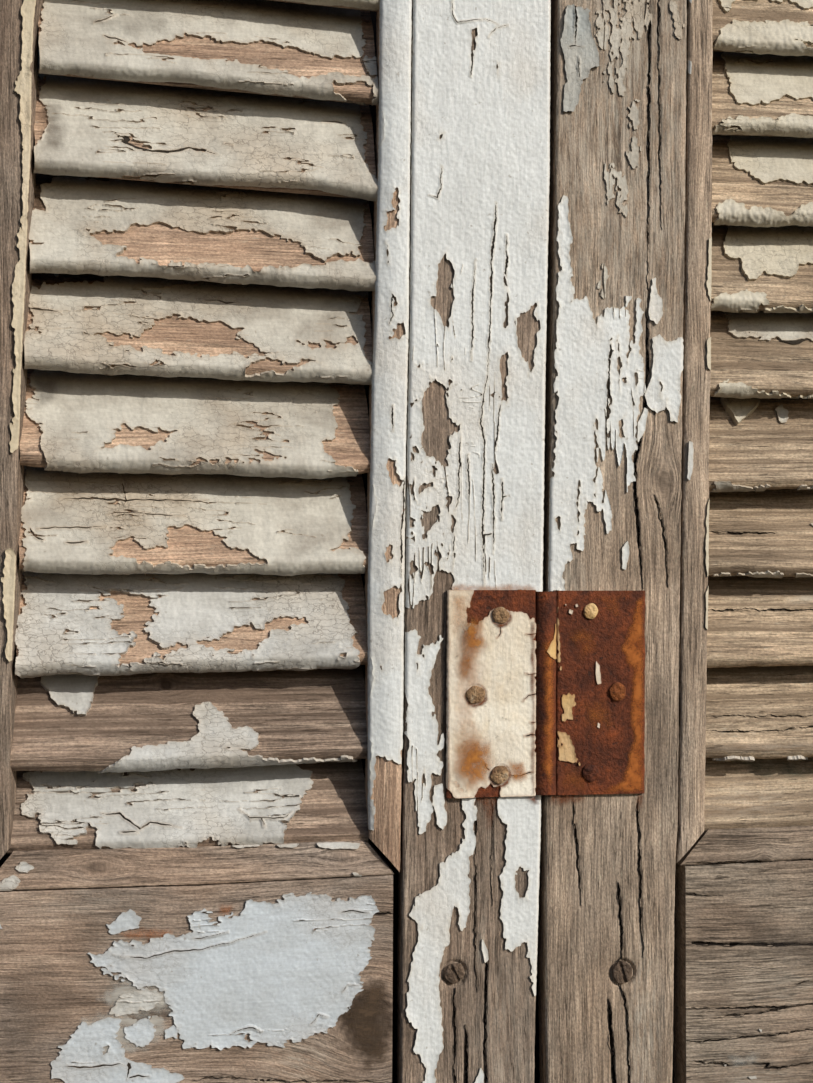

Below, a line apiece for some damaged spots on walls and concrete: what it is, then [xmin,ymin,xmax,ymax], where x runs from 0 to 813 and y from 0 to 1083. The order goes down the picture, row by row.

peeling [560,0,652,112]
peeling [604,99,642,217]
peeling [712,0,813,185]
peeling [706,199,813,342]
peeling [548,195,684,592]
peeling [0,0,551,1083]
corrosion [463,622,483,675]
corrosion [460,742,524,787]
corrosion [531,643,552,775]
peeling [557,693,581,766]
corrosion [614,601,642,790]
crack [608,798,644,1083]